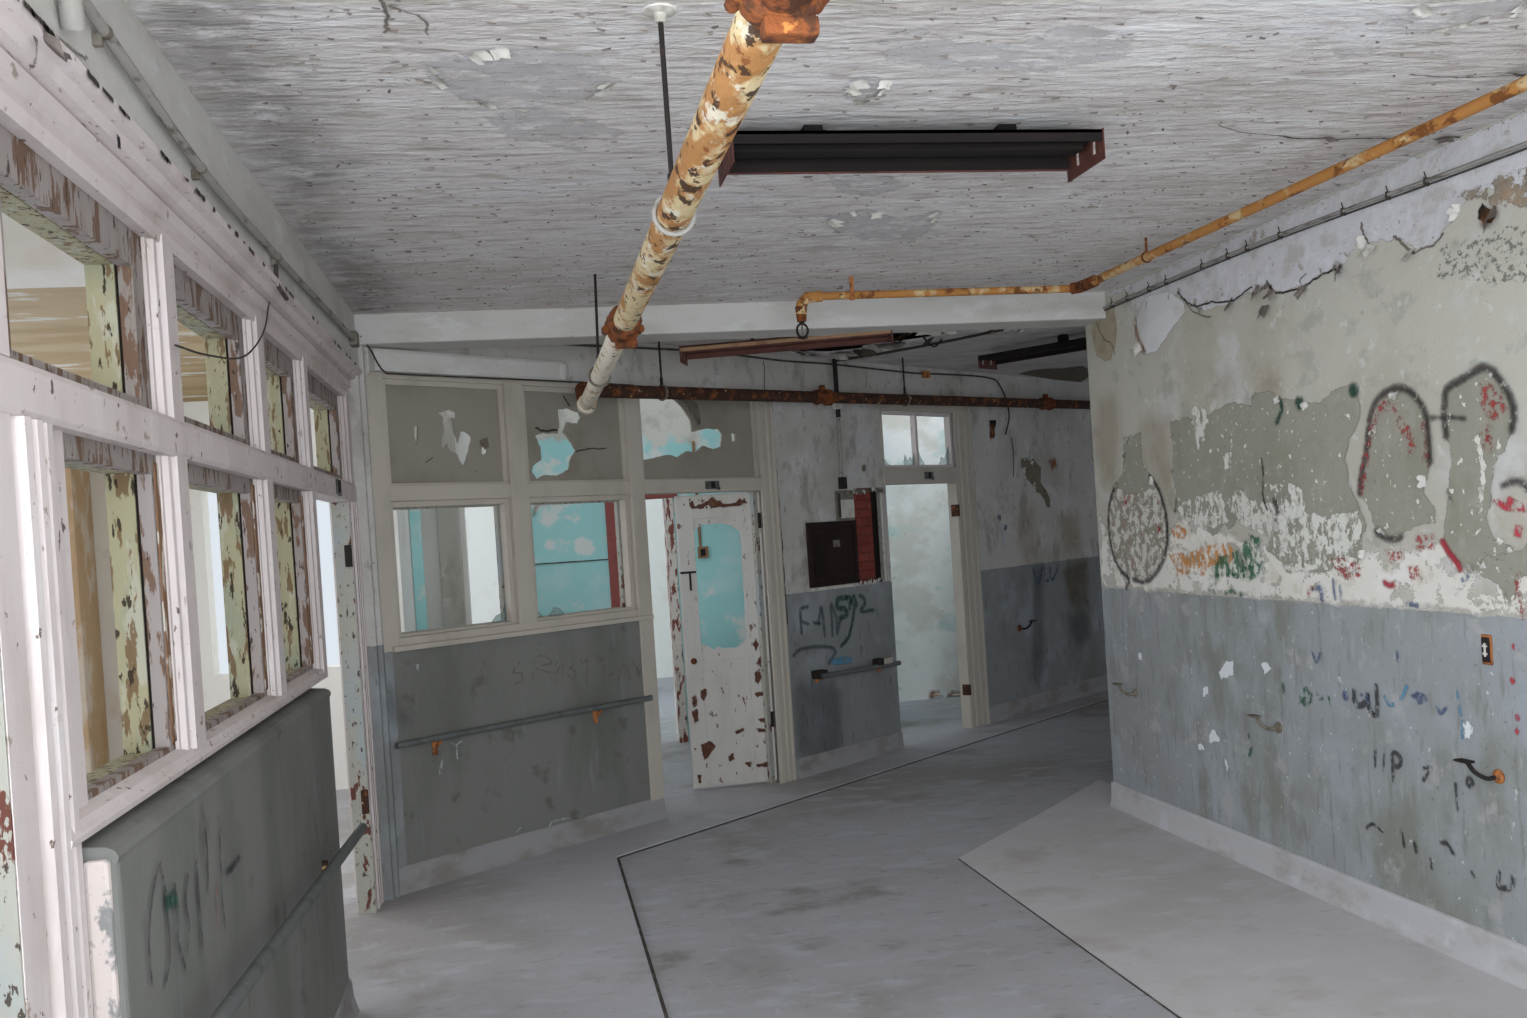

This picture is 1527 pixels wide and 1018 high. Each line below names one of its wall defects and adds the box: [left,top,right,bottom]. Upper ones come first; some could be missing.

crack [379,0,429,35]
peeling [306,0,662,308]
flaking render [652,57,1527,361]
peeling [689,497,747,509]
flaking render [1021,458,1050,507]
peeling [1099,363,1527,617]
peeling [753,639,763,697]
peeling [692,689,707,723]
peeling [698,741,768,783]